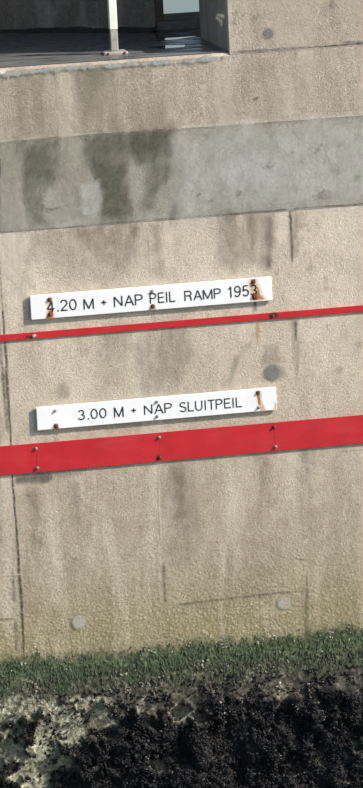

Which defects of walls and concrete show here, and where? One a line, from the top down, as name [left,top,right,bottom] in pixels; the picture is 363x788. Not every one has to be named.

damp [88,128,174,219]
crack [229,203,363,260]
crack [0,295,12,445]
crack [0,474,25,659]